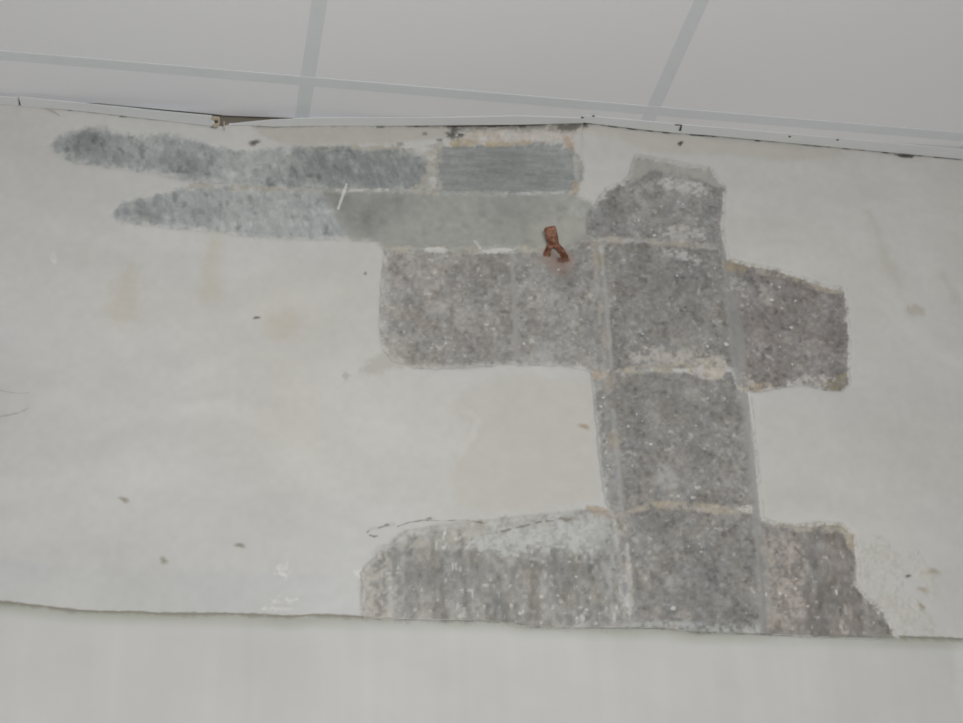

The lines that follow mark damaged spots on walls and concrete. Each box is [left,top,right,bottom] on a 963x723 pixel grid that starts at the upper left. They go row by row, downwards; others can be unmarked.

flaking render [48,115,897,640]